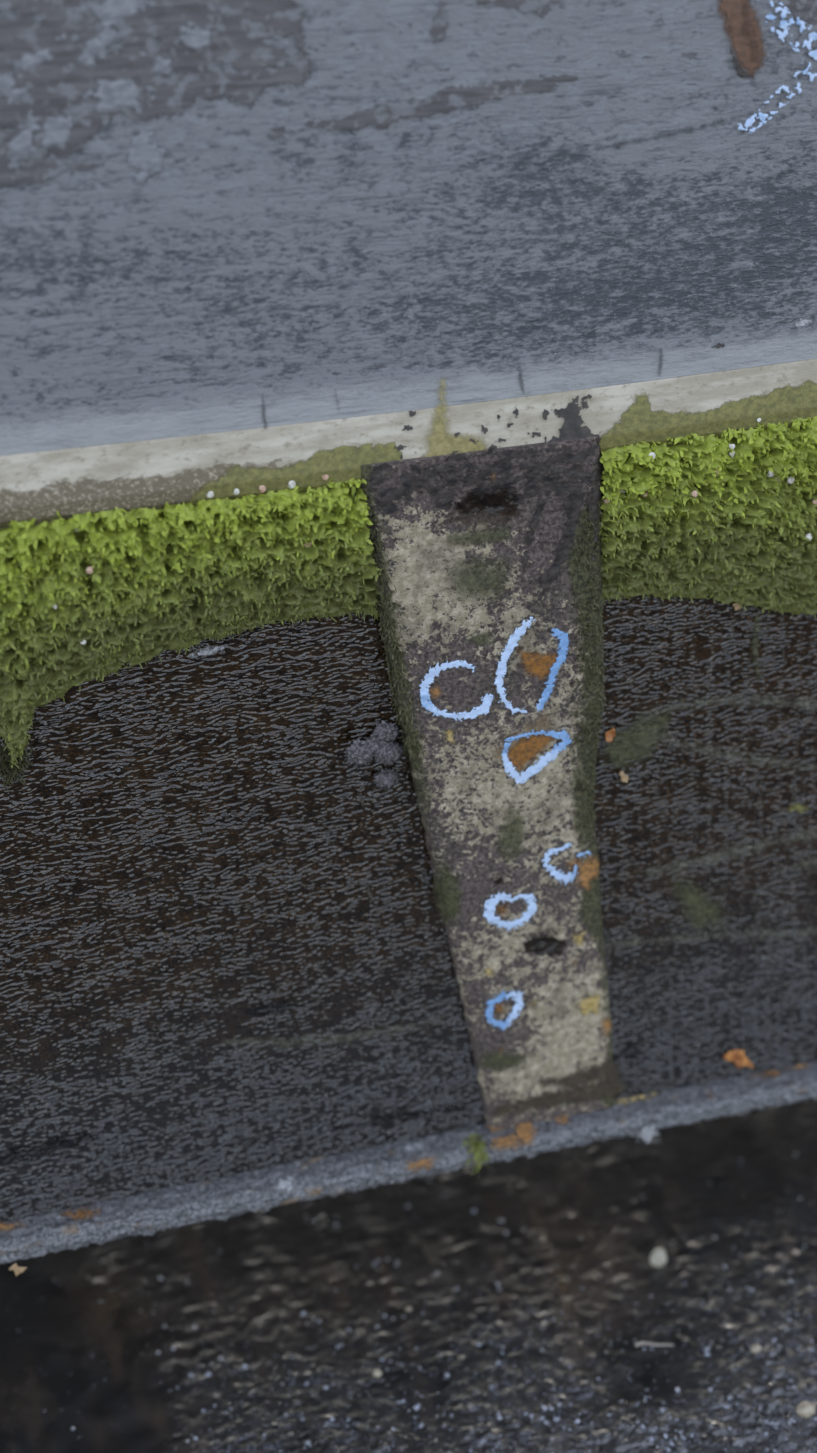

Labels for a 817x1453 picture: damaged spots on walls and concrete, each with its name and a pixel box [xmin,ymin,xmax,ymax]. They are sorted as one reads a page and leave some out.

peeling [477,0,559,18]
rust [719,0,766,78]
peeling [0,0,312,187]
peeling [305,74,578,130]